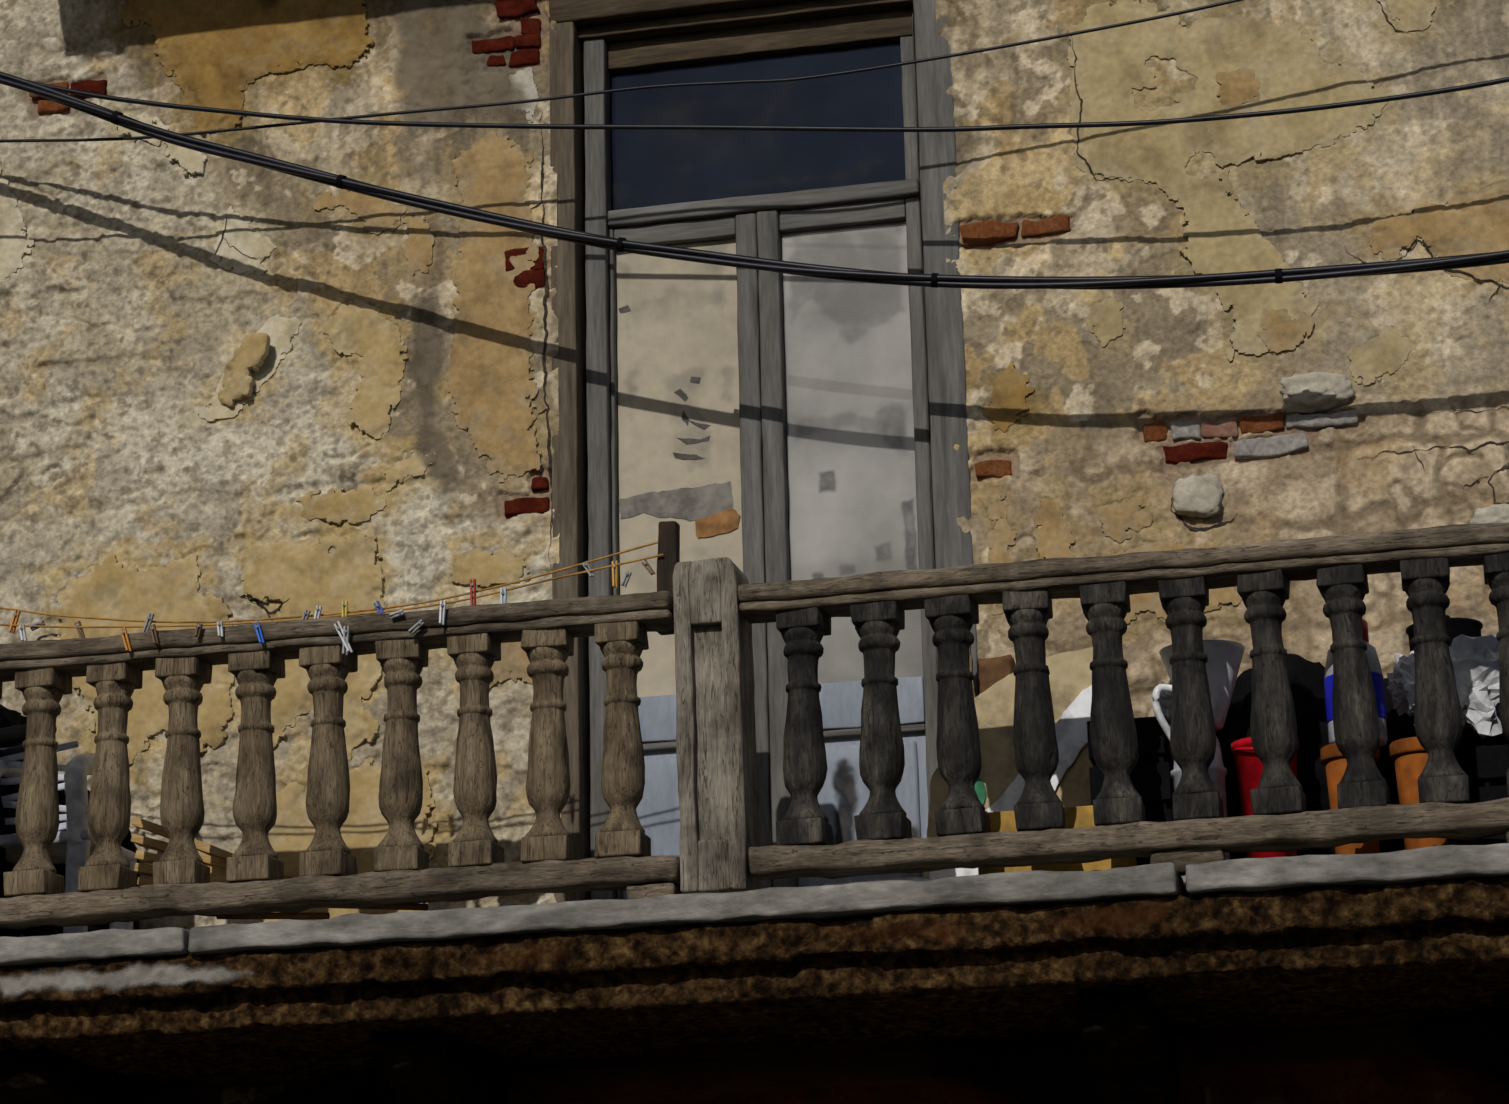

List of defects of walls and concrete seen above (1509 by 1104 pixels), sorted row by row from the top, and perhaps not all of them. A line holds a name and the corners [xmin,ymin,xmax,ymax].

flaking render [471,0,542,68]
flaking render [114,0,375,176]
crack [1344,237,1509,300]
flaking render [447,131,550,517]
flaking render [1143,410,1358,464]
crack [1357,406,1509,504]
flaking render [127,670,169,765]
flaking render [197,664,235,754]
flaking render [271,659,314,749]
flaking render [489,642,533,690]
flaking render [340,653,389,874]
flaking render [268,782,315,870]